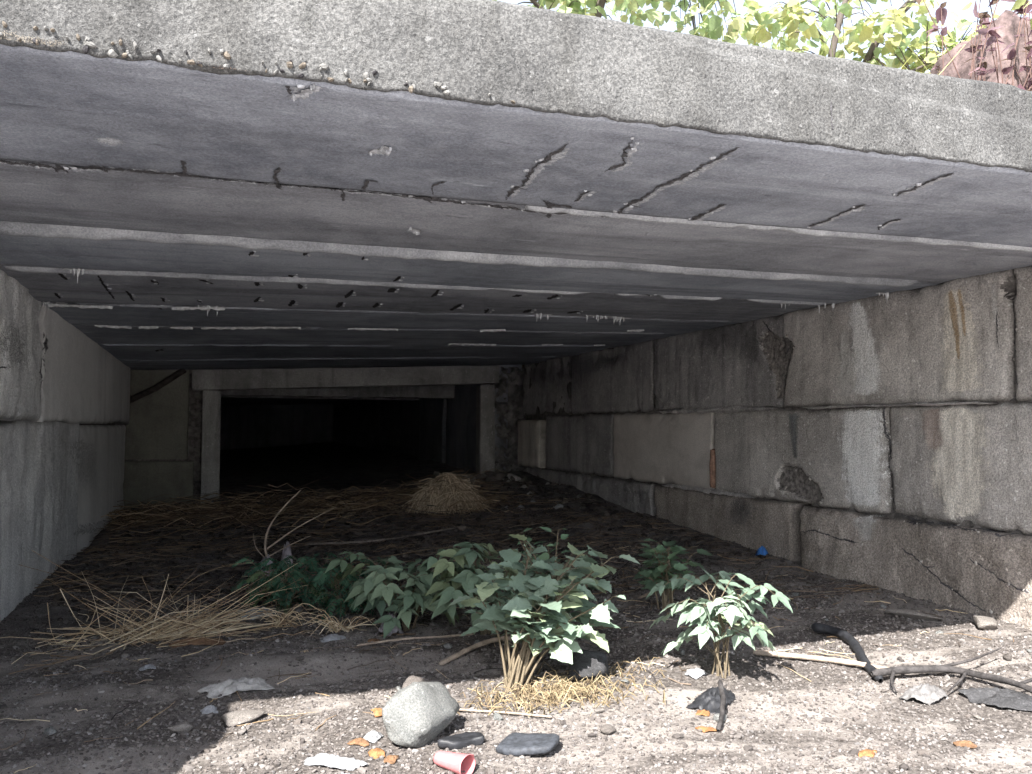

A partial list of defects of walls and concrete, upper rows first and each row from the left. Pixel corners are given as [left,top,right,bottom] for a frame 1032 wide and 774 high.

crack [0,137,747,229]
crack [807,173,955,230]
spalling [758,330,795,398]
corrosion [935,288,986,394]
crack [882,408,1019,537]
crack [902,548,993,615]
crack [969,558,1029,593]